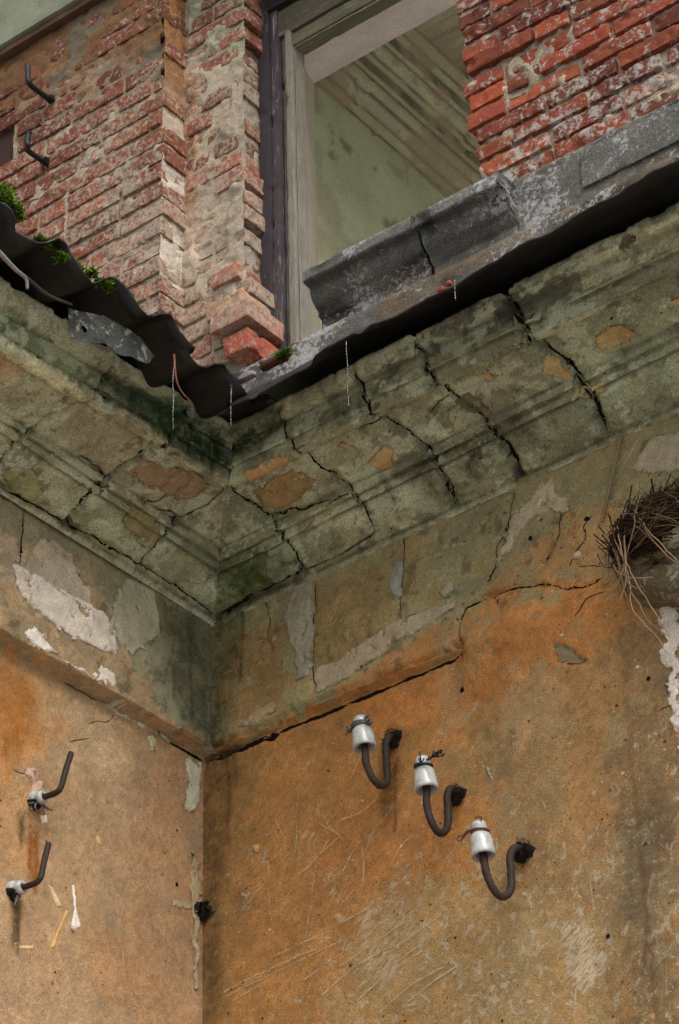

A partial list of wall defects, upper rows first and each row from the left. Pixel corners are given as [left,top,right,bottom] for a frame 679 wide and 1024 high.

flaking render [125,454,210,511]
crack [2,404,375,683]
flaking render [229,433,427,516]
crack [354,372,457,501]
crack [414,343,521,465]
flaking render [474,476,600,582]
crack [506,294,607,429]
flaking render [626,431,679,482]
flaking render [275,547,472,693]
crack [170,494,605,762]
crack [63,682,113,741]
flaking render [9,537,202,853]